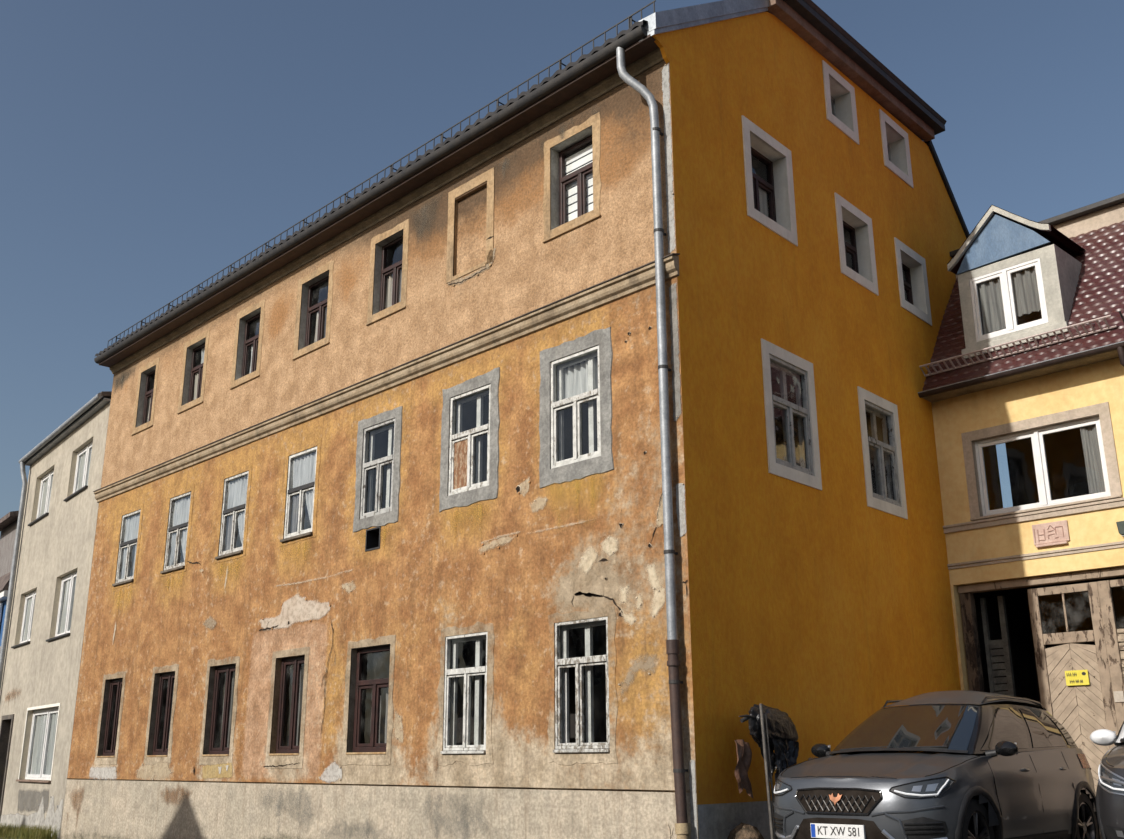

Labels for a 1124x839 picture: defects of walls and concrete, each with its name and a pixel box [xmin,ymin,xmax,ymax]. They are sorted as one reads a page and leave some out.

peeling [479,534,518,554]
flaking render [579,523,624,573]
flaking render [260,595,331,630]
flaking render [618,565,665,625]
crack [320,622,333,737]
flaking render [319,762,342,782]